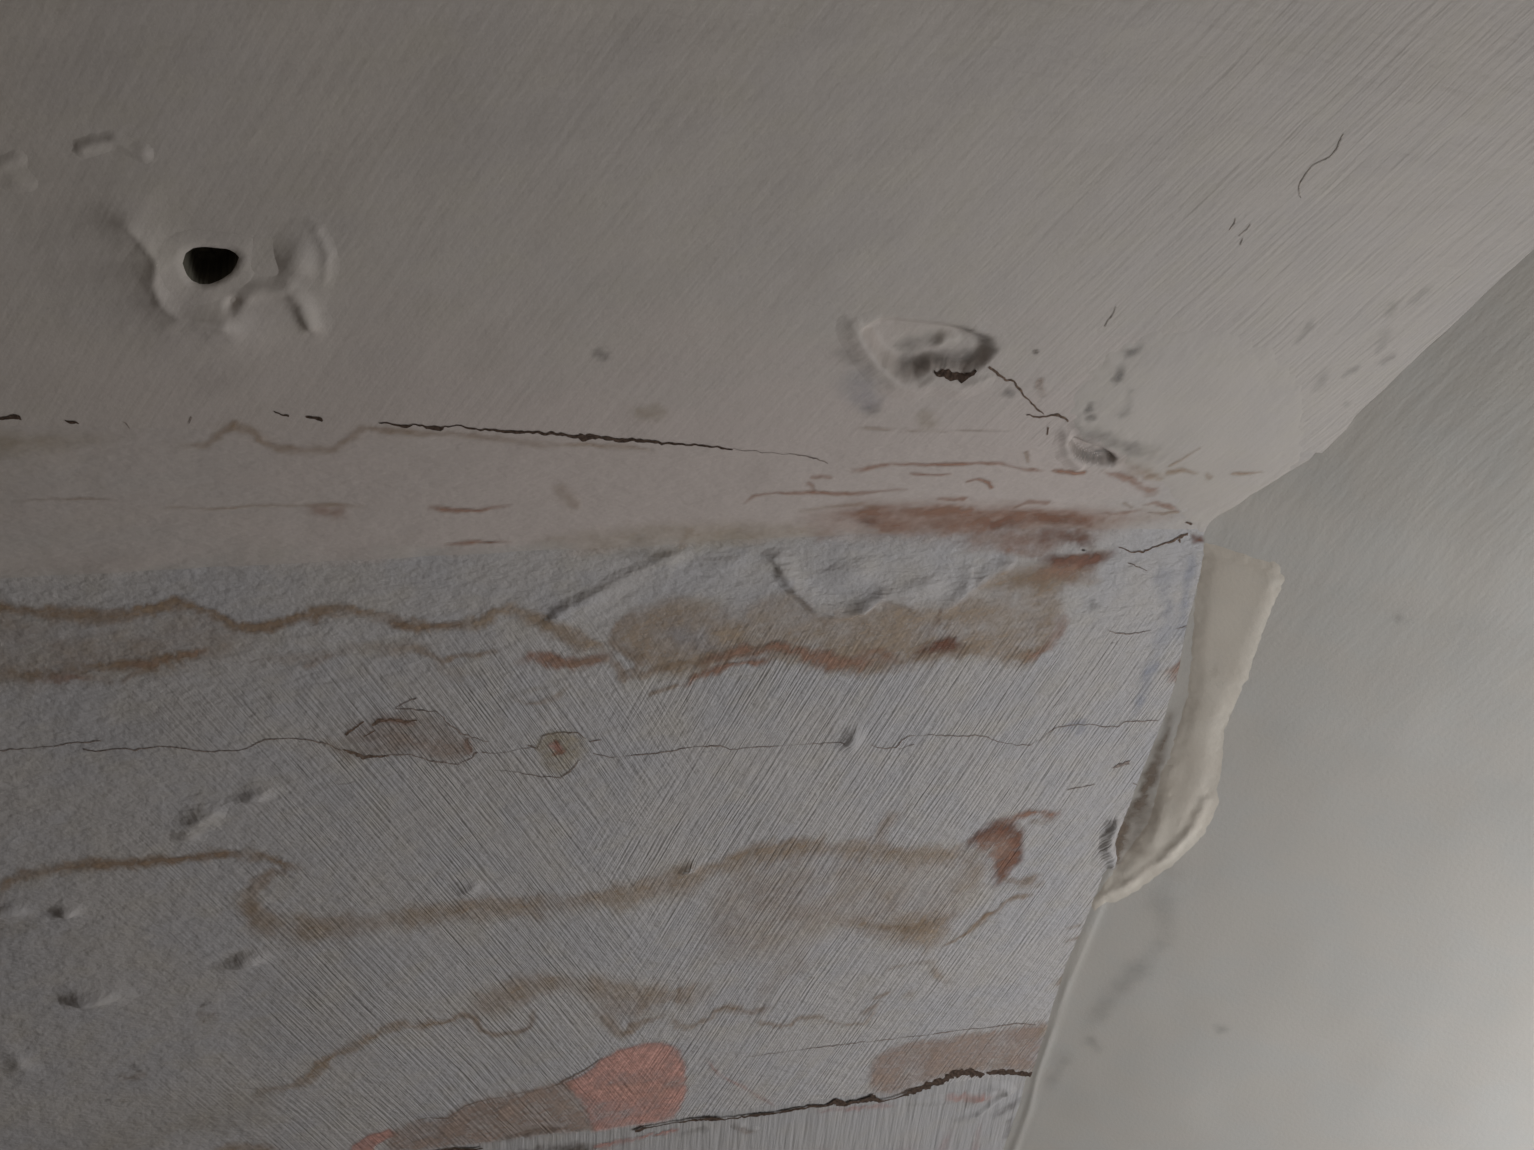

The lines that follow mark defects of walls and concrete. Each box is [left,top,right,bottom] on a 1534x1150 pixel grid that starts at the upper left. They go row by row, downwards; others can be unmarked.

crack [0,413,21,421]
crack [274,411,323,422]
crack [988,366,1069,435]
crack [379,422,828,464]
water stain [0,597,363,633]
water stain [392,609,508,632]
water stain [529,640,607,669]
water stain [621,607,1050,688]
peeling [344,708,487,765]
peeling [1091,543,1285,911]
water stain [57,851,231,870]
crack [635,1068,1032,1132]